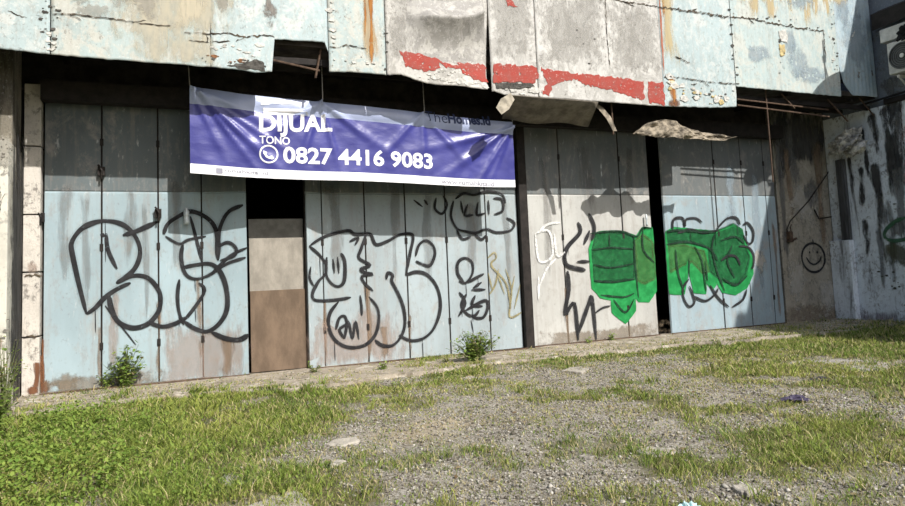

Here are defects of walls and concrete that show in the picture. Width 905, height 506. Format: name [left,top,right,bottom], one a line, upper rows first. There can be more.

peeling [205,43,266,71]
corrosion [363,0,376,62]
peeling [399,9,739,106]
corrosion [659,0,673,68]
corrosion [752,0,774,16]
corrosion [669,79,680,106]
damp [755,111,825,310]
damp [847,76,905,286]
corrosion [27,340,50,395]